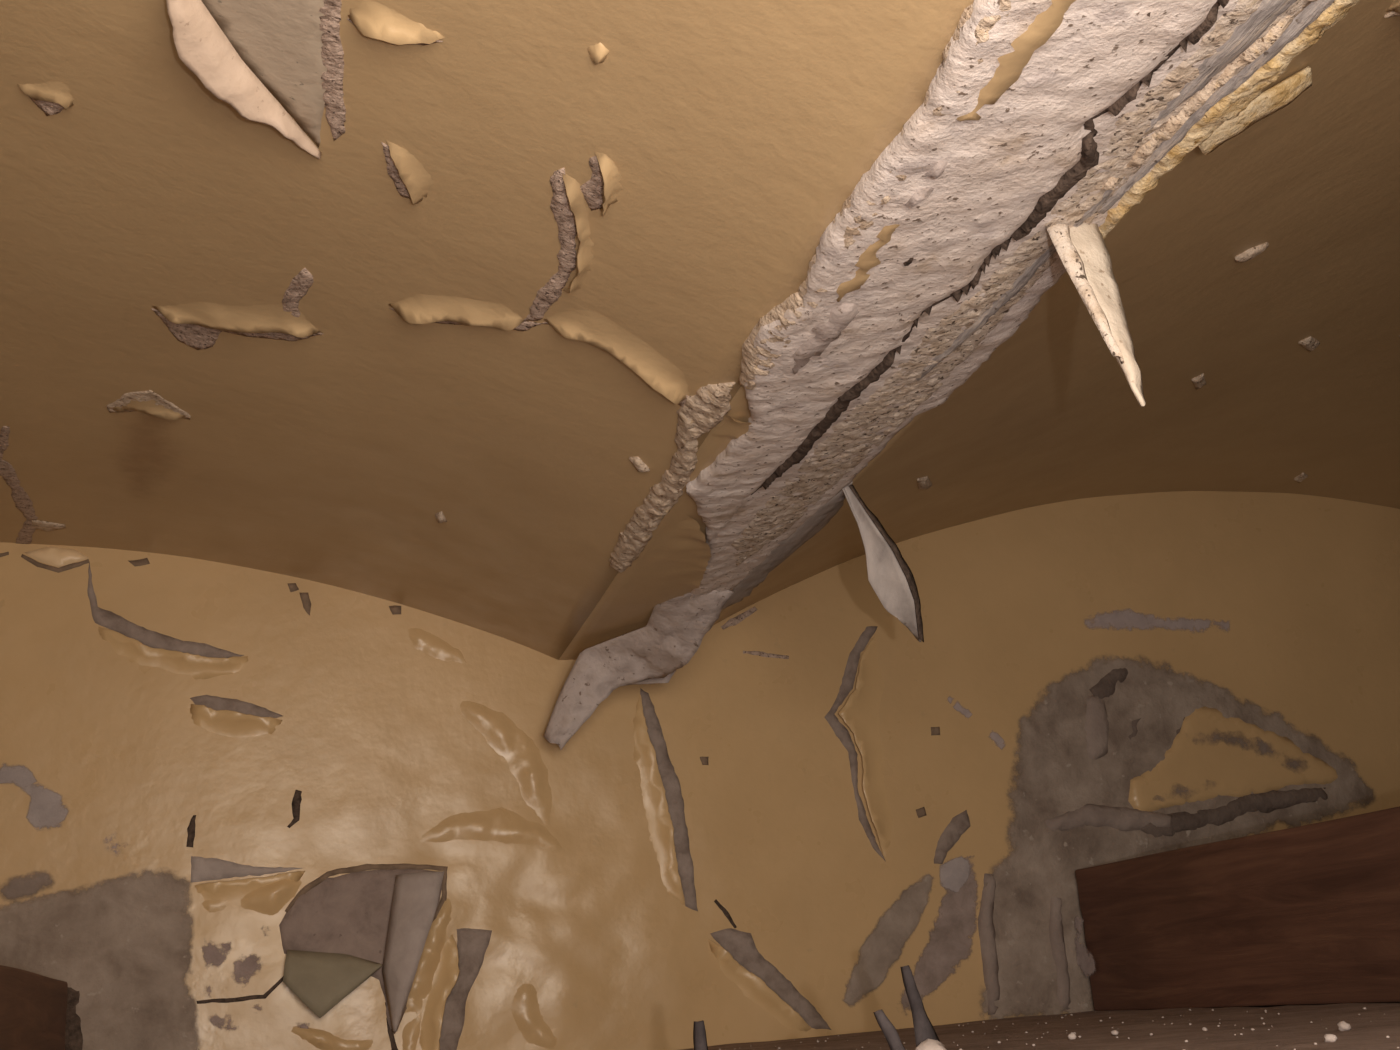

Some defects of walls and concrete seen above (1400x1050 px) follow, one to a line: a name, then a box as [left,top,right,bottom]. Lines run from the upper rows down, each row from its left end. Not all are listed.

peeling [166,0,327,159]
crack [319,0,346,140]
spalling [609,0,1360,642]
peeling [0,546,282,738]
peeling [633,688,698,911]
peeling [824,626,893,862]
spalling [1089,668,1128,699]
peeling [186,815,448,1050]
peeling [419,928,492,1050]
peeling [708,928,831,1031]
peeling [873,1009,906,1050]
peeling [844,810,978,1010]